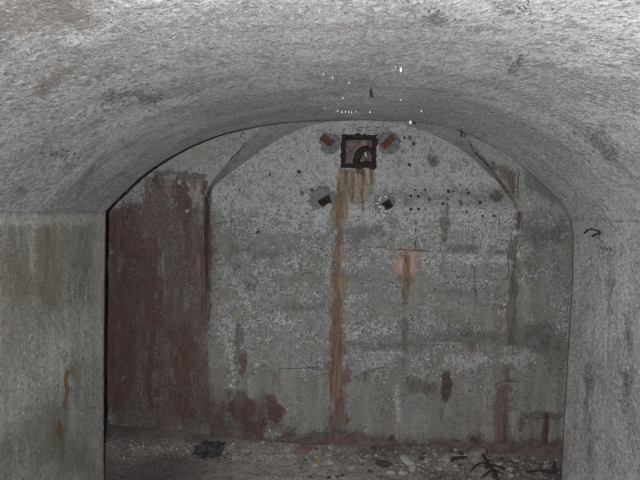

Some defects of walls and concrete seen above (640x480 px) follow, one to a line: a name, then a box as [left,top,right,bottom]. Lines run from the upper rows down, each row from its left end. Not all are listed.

corrosion [104,164,563,459]